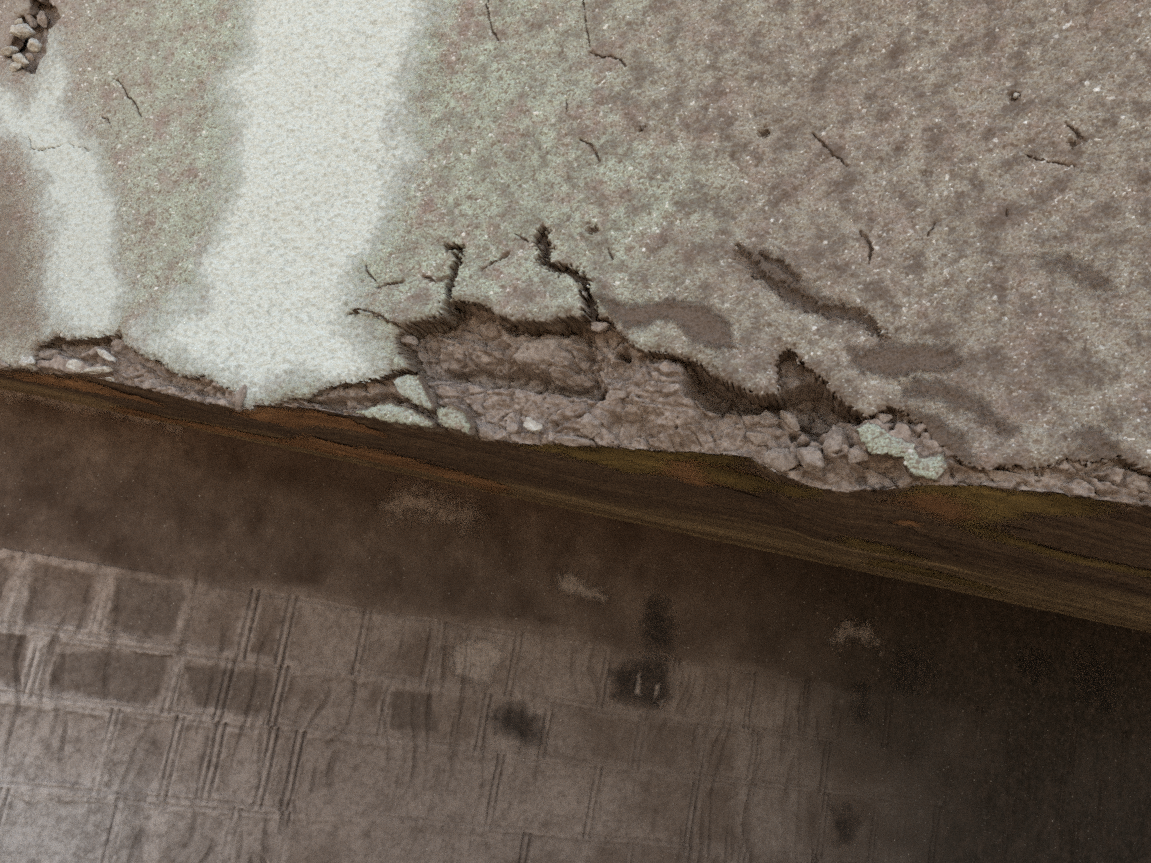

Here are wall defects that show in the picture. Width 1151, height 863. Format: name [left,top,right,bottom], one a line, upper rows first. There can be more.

spalling [0,3,60,74]
crack [349,308,404,329]
crack [425,234,598,322]
crack [741,254,879,336]
spalling [0,244,1151,506]
leakage [527,443,823,499]
leakage [904,485,1151,578]
leakage [615,661,667,703]
leakage [496,709,535,739]